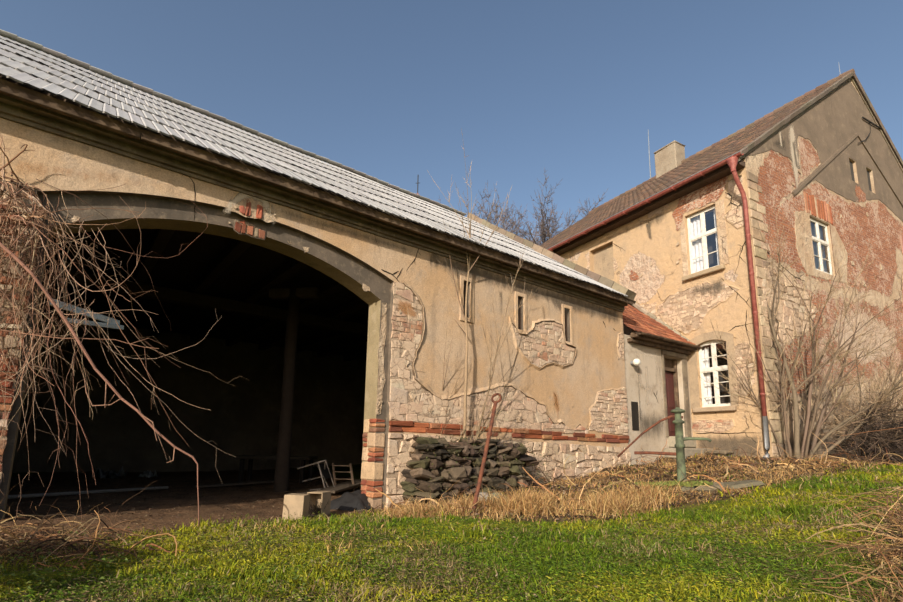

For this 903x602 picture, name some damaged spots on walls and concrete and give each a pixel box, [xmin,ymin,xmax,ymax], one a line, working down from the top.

spalling [228,192,276,240]
peeling [613,252,739,335]
peeling [672,137,903,403]
peeling [376,280,628,435]
peeling [385,433,481,509]
peeling [497,439,631,483]